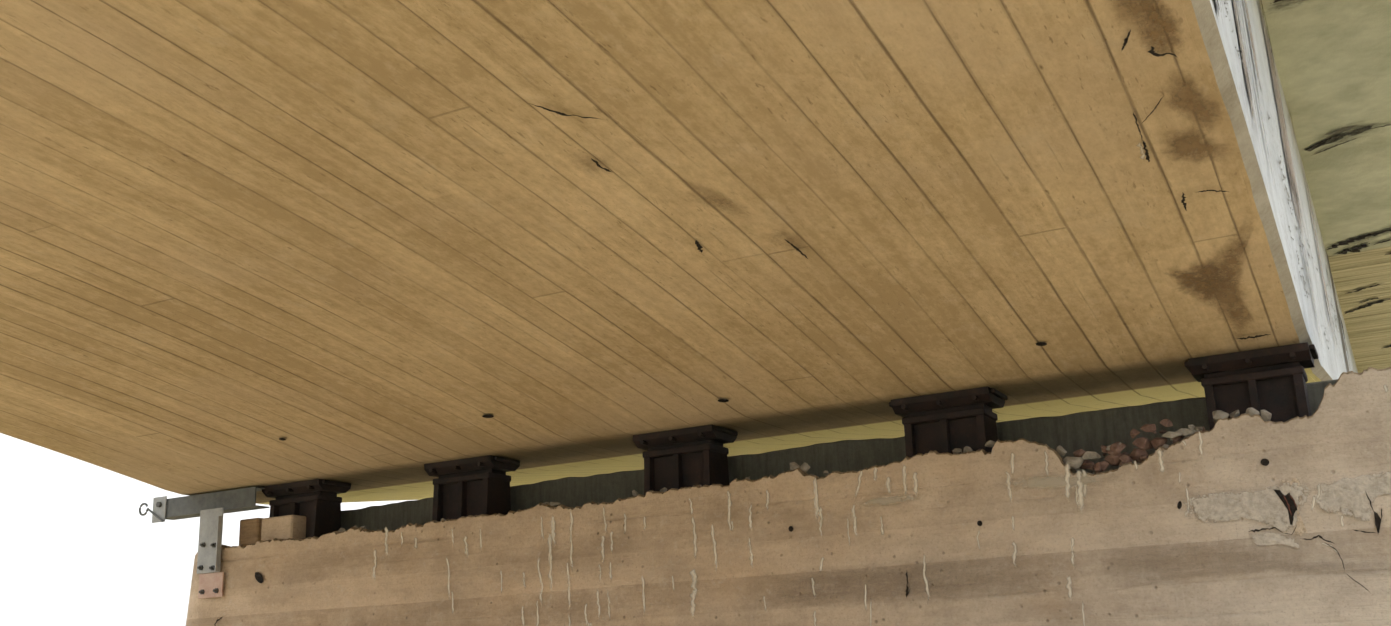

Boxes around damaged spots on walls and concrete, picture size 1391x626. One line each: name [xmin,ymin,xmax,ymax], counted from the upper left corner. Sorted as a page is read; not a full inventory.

water stain [1171,80,1218,161]
water stain [1326,125,1369,142]
water stain [1177,242,1249,327]
spalling [1056,407,1272,474]
water stain [521,507,626,626]
water stain [689,490,769,614]
water stain [847,466,918,543]
water stain [1006,452,1095,507]
water stain [1158,450,1189,511]
spalling [1184,472,1391,549]
crack [1300,491,1382,590]